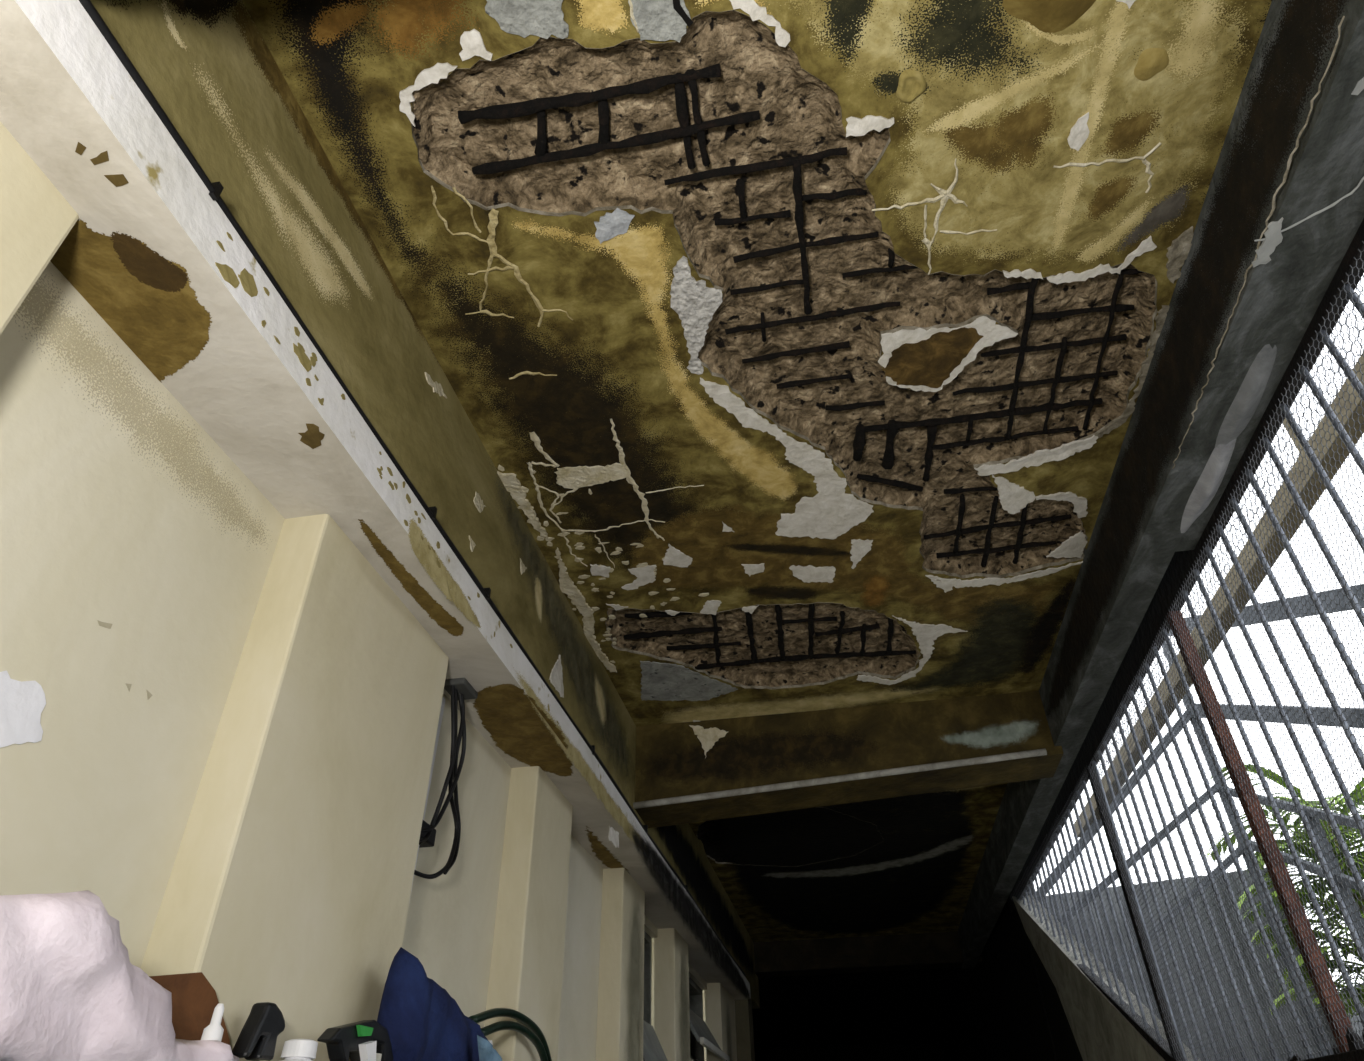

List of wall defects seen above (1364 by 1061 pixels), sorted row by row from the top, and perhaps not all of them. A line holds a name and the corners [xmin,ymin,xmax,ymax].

spalling [75,142,129,187]
damp [50,219,213,382]
peeling [215,232,270,297]
peeling [261,320,324,405]
peeling [298,424,325,449]
crack [431,186,573,327]
crack [527,419,704,568]
damp [105,0,1347,791]
spalling [399,0,1194,593]
crack [872,158,997,275]
spalling [497,465,968,701]
damp [473,667,990,1061]